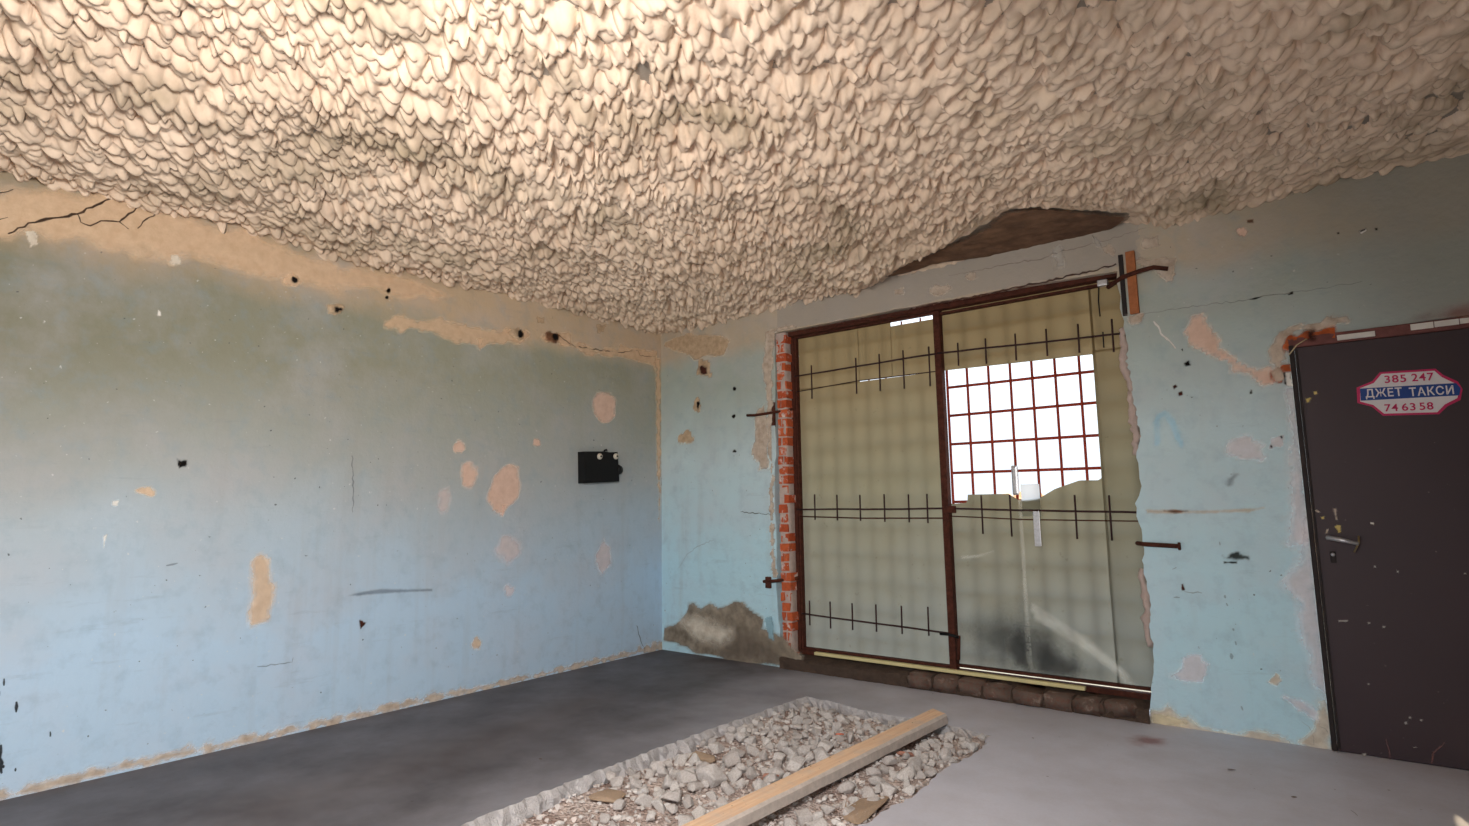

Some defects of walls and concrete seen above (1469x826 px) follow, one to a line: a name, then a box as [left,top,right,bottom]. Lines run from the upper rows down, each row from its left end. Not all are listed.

crack [0,189,155,234]
flaking render [0,193,436,299]
flaking render [1181,315,1349,394]
flaking render [1294,473,1341,542]
spalling [0,317,802,800]
spalling [1138,568,1153,647]
flaking render [1288,560,1323,685]
flaking render [1150,701,1332,750]